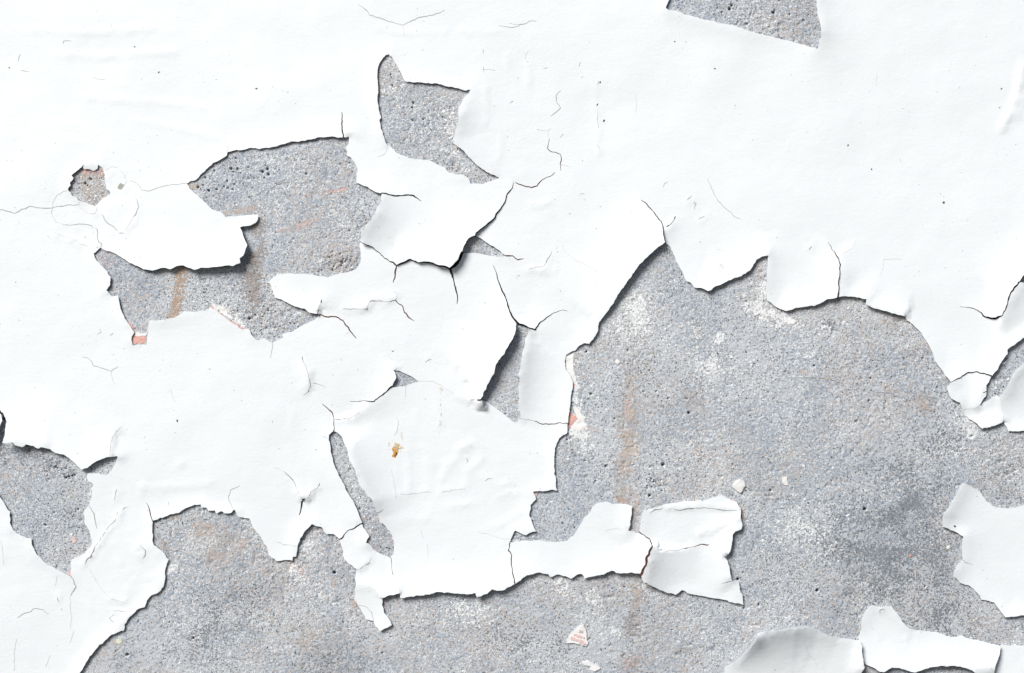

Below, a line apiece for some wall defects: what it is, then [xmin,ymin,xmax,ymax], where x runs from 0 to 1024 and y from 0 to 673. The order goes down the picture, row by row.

spalling [666,0,822,49]
crack [0,166,186,247]
spalling [68,165,124,205]
crack [317,90,569,338]
peeling [94,54,1024,631]
peeling [0,395,121,576]